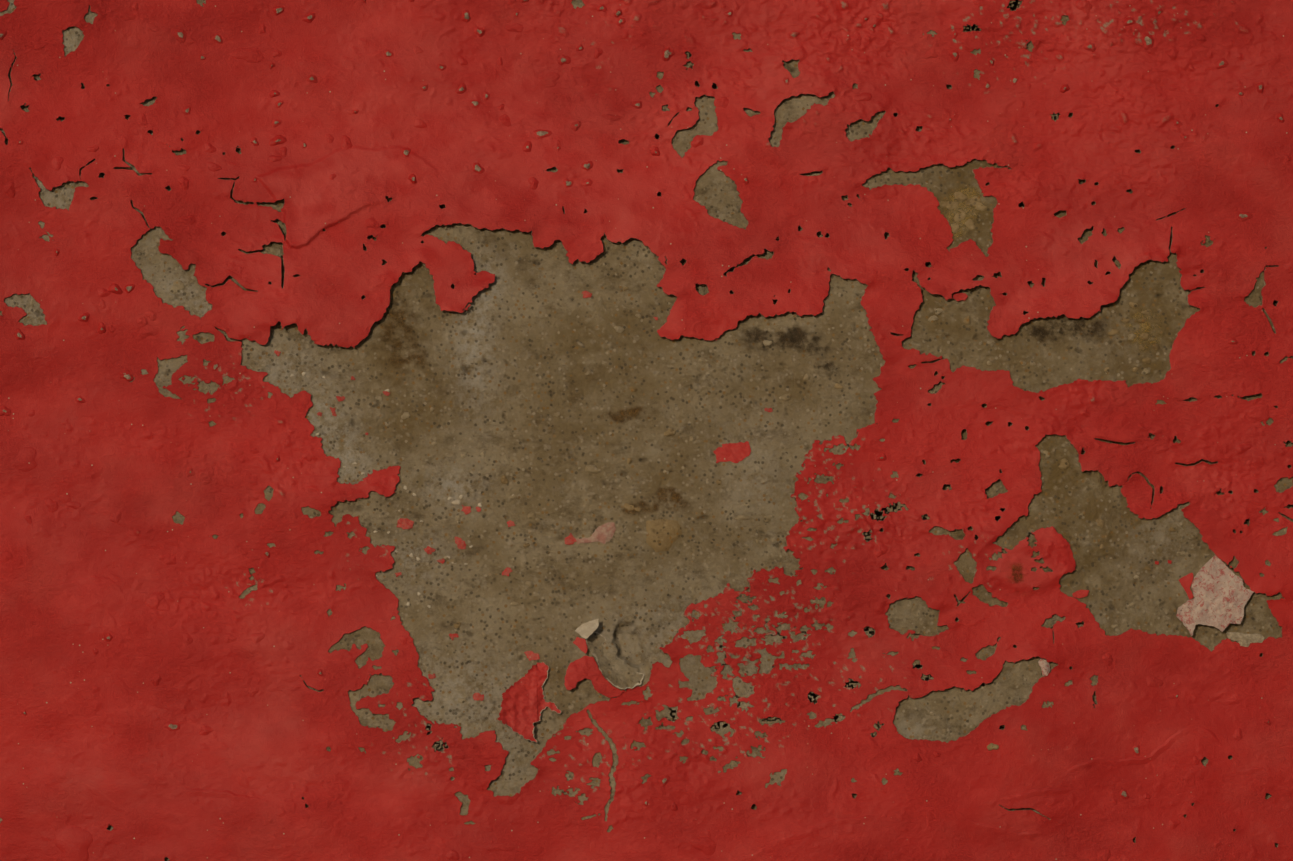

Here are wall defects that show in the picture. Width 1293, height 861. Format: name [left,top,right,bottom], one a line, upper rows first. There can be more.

peeling [782,60,800,78]
peeling [744,92,835,147]
peeling [693,161,748,229]
peeling [862,159,1010,257]
peeling [0,294,47,326]
peeling [130,223,1287,832]